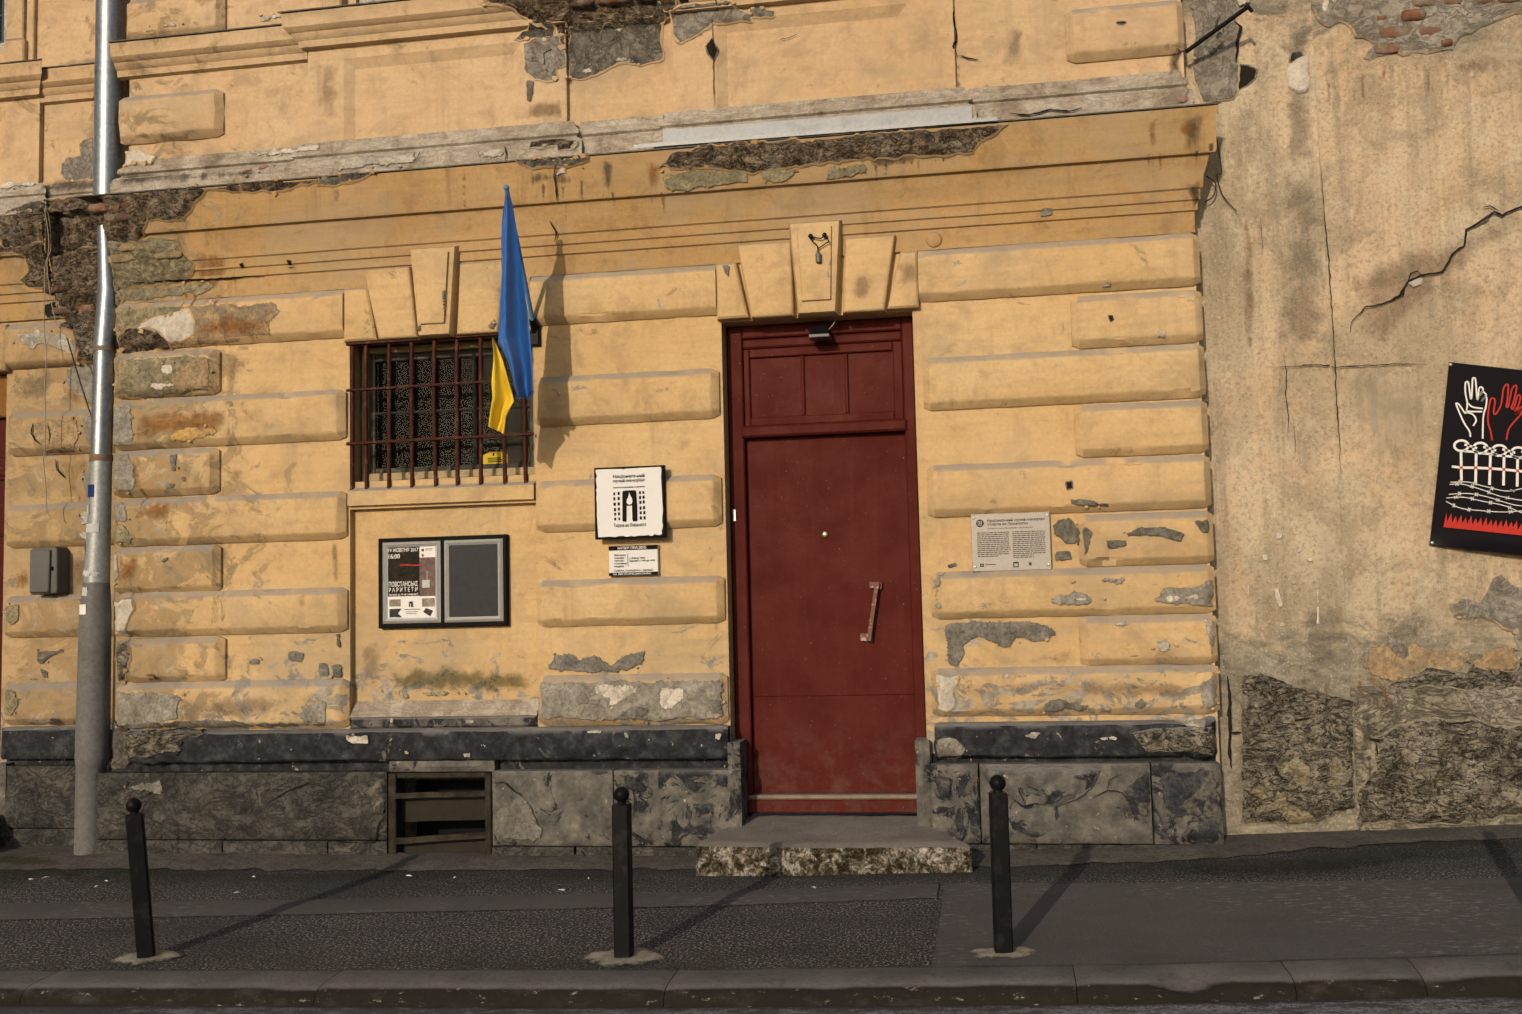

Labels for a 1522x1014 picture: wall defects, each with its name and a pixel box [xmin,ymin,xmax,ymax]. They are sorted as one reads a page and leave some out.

flaking render [480,0,775,101]
flaking render [1160,0,1250,104]
flaking render [1311,0,1522,60]
flaking render [659,124,1008,192]
crack [1283,173,1522,477]
flaking render [0,136,415,795]
peeling [1053,499,1209,560]
peeling [934,563,1056,713]
peeling [1155,580,1215,654]
peeling [540,651,725,740]
peeling [1100,671,1220,818]
flaking render [1239,573,1522,826]